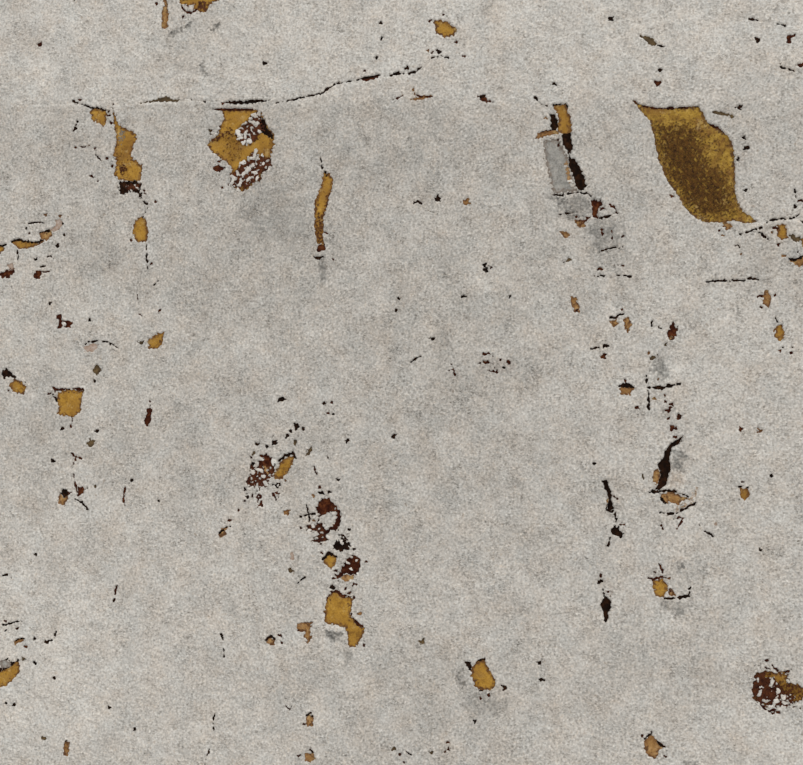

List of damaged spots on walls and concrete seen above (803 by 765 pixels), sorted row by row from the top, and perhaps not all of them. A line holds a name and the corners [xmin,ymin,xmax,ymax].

crack [140,96,206,104]
crack [225,49,466,105]
peeling [72,99,157,269]
peeling [207,102,275,192]
peeling [313,158,334,260]
peeling [633,101,757,236]
peeling [47,386,84,431]
peeling [238,423,312,511]
crack [635,351,697,516]
peeling [299,485,368,648]
peeling [465,658,507,700]
peeling [751,659,803,715]